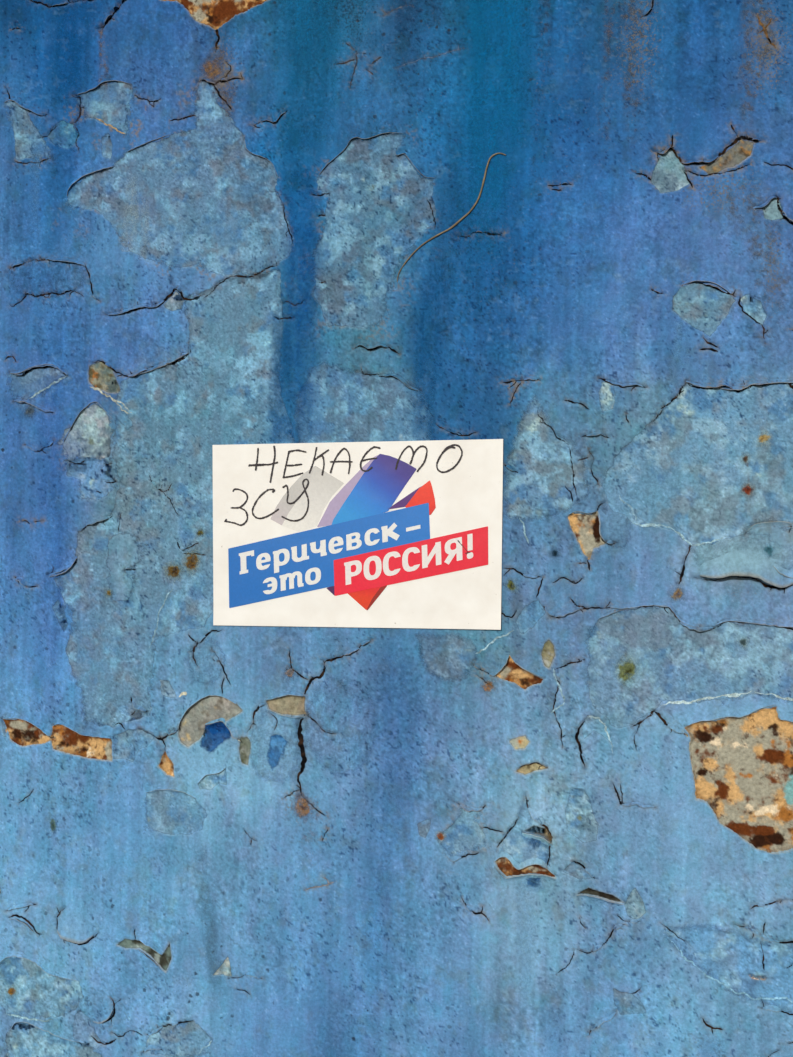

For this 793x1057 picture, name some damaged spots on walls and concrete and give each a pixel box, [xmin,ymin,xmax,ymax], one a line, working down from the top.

rust [163,0,266,30]
peeling [4,99,79,161]
peeling [672,277,767,336]
crack [694,282,793,338]
peeling [6,361,67,412]
peeling [48,78,436,768]
rust [568,507,610,560]
crack [501,529,793,632]
rust [3,716,113,761]
crack [229,640,371,841]
crack [553,659,585,766]
rust [684,702,793,853]